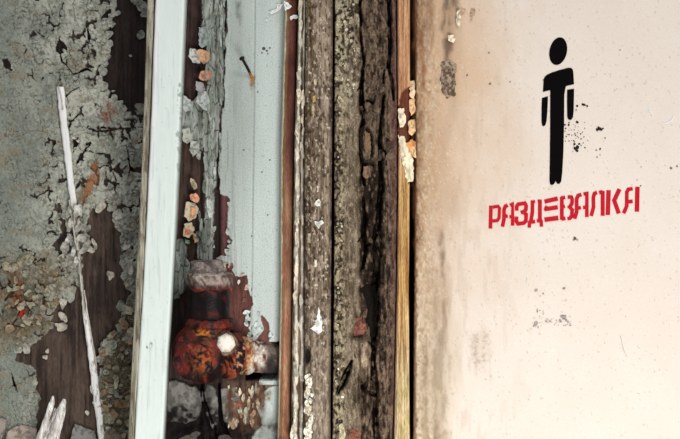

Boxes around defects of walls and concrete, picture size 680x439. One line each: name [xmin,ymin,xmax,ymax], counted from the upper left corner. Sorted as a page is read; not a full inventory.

peeling [53,38,67,54]
peeling [98,0,147,115]
peeling [72,137,90,166]
peeling [177,0,274,344]
spalling [398,80,416,182]
peeling [2,197,136,439]